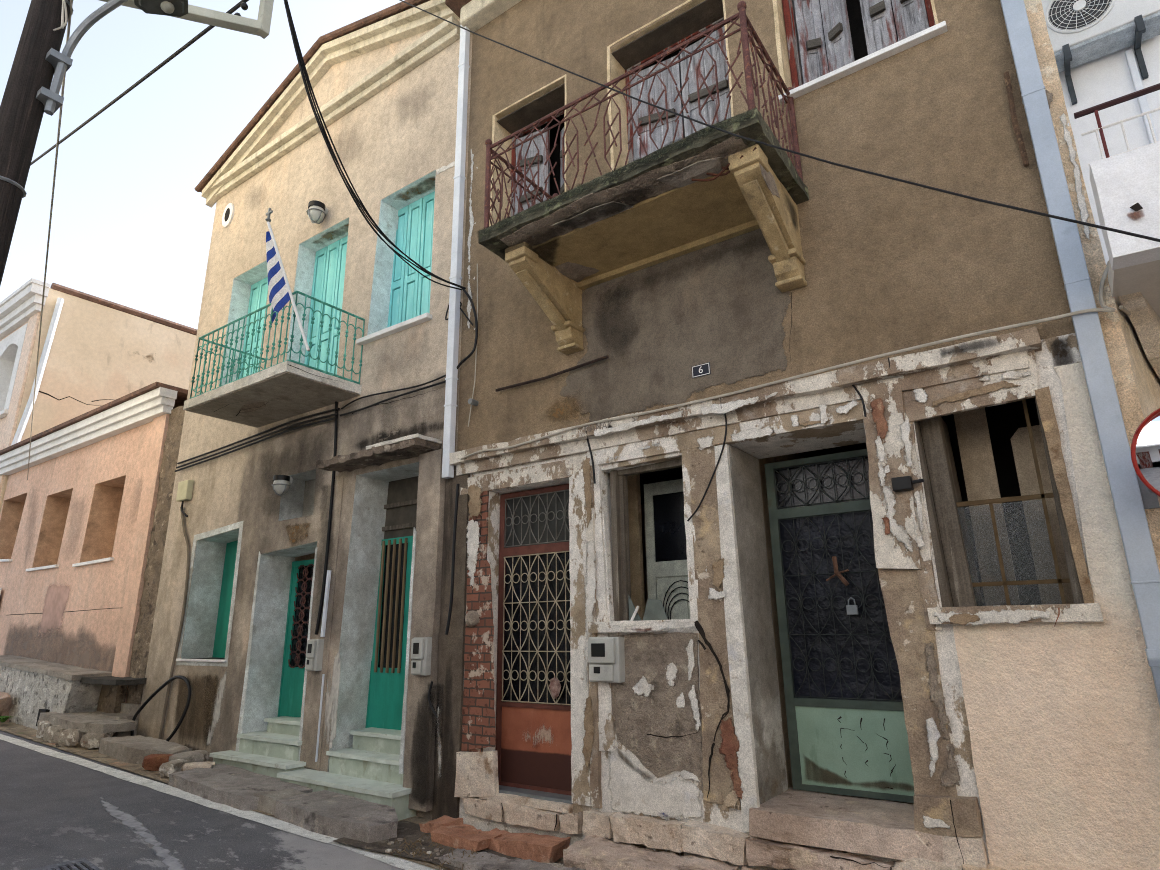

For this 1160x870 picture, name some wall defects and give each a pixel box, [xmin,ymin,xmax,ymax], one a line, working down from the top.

damp [498,188,647,266]
peeling [594,411,682,437]
peeling [700,392,778,415]
peeling [730,425,773,442]
peeling [912,370,1032,408]
damp [5,626,116,672]
flaking render [463,484,496,750]
peeling [582,458,597,772]
peeling [934,609,1051,626]
spalling [608,619,703,821]
peeling [924,642,961,787]
spalling [718,718,744,810]